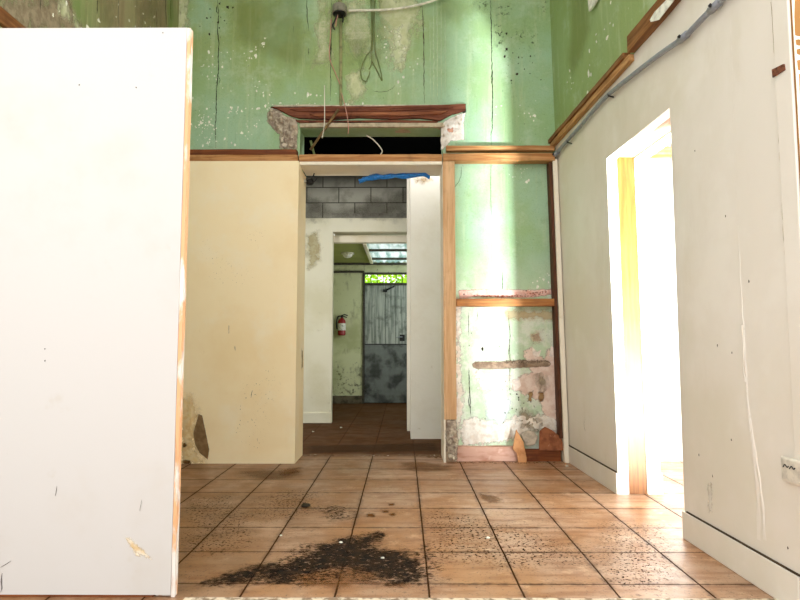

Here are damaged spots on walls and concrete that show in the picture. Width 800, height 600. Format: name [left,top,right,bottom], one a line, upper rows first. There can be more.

crack [213,0,221,148]
spalling [227,81,298,149]
spalling [441,110,466,150]
flaking render [446,273,557,462]
peeling [192,414,209,459]